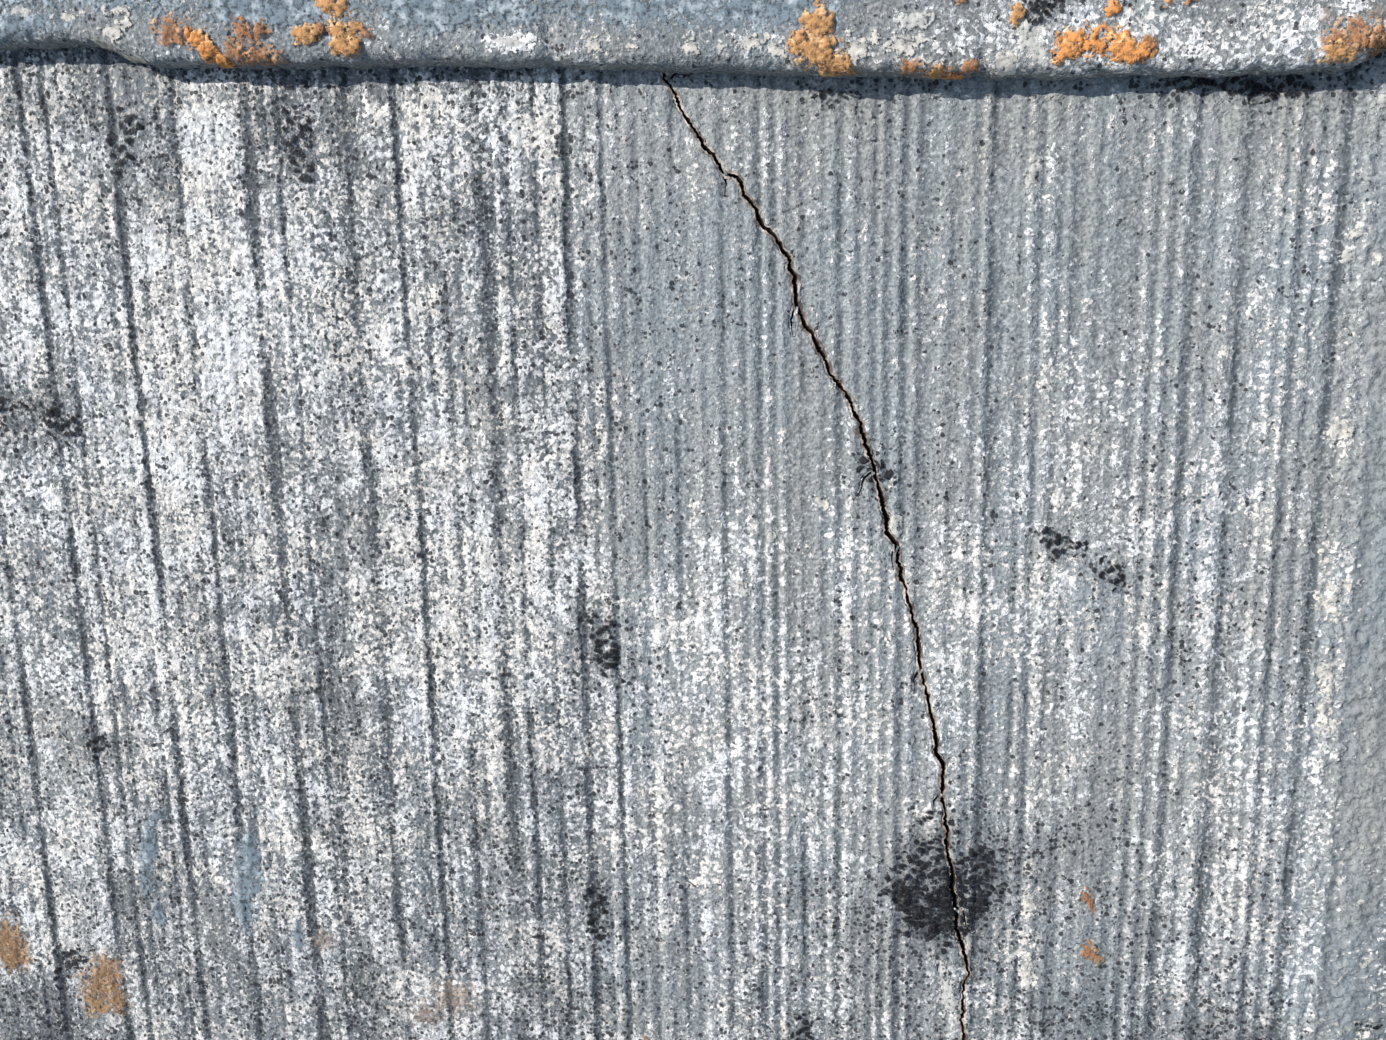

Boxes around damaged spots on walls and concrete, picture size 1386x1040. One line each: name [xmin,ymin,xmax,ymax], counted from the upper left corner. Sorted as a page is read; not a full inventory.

crack [660,72,975,1040]